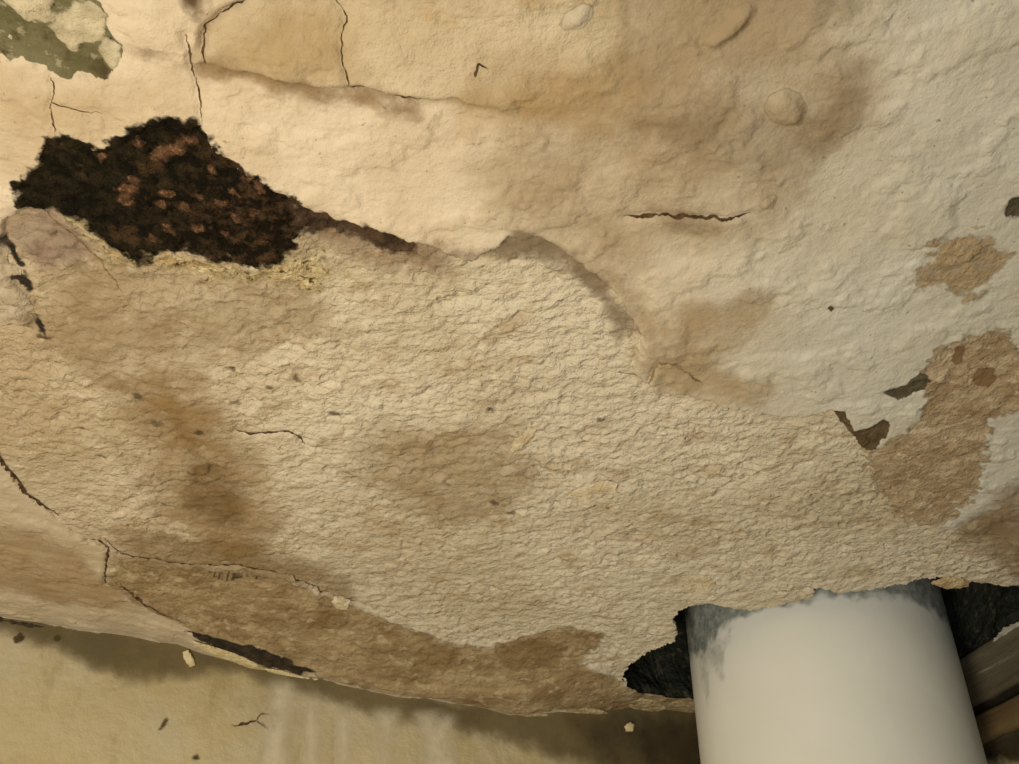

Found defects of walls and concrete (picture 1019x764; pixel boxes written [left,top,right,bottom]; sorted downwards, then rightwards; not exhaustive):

peeling [0,0,123,80]
crack [185,0,244,113]
crack [336,1,428,100]
water stain [628,0,806,183]
crack [625,212,750,222]
crack [0,235,45,336]
crack [0,456,59,516]
flaking render [0,207,1019,717]
water stain [961,489,1019,575]
crack [85,538,359,680]
water stain [0,618,701,764]